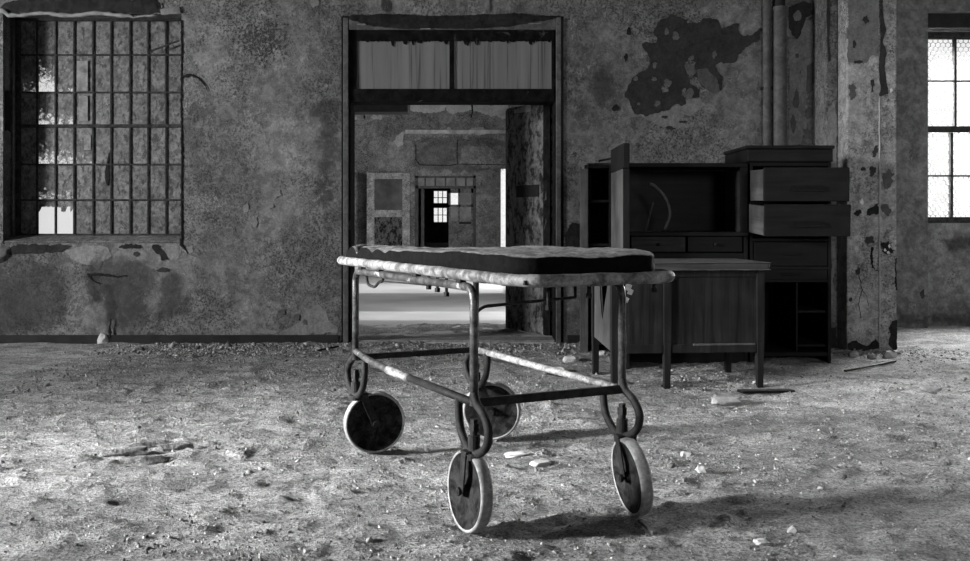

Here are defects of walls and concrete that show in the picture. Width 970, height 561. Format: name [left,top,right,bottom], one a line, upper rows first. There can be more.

peeling [612,14,762,131]
peeling [788,1,813,145]
peeling [846,0,893,96]
flaking render [861,145,894,189]
flaking render [854,198,892,216]
peeling [10,243,193,272]
leakage [87,261,149,329]
crack [858,247,898,316]
flaking render [865,236,893,254]
flaking render [848,320,897,351]